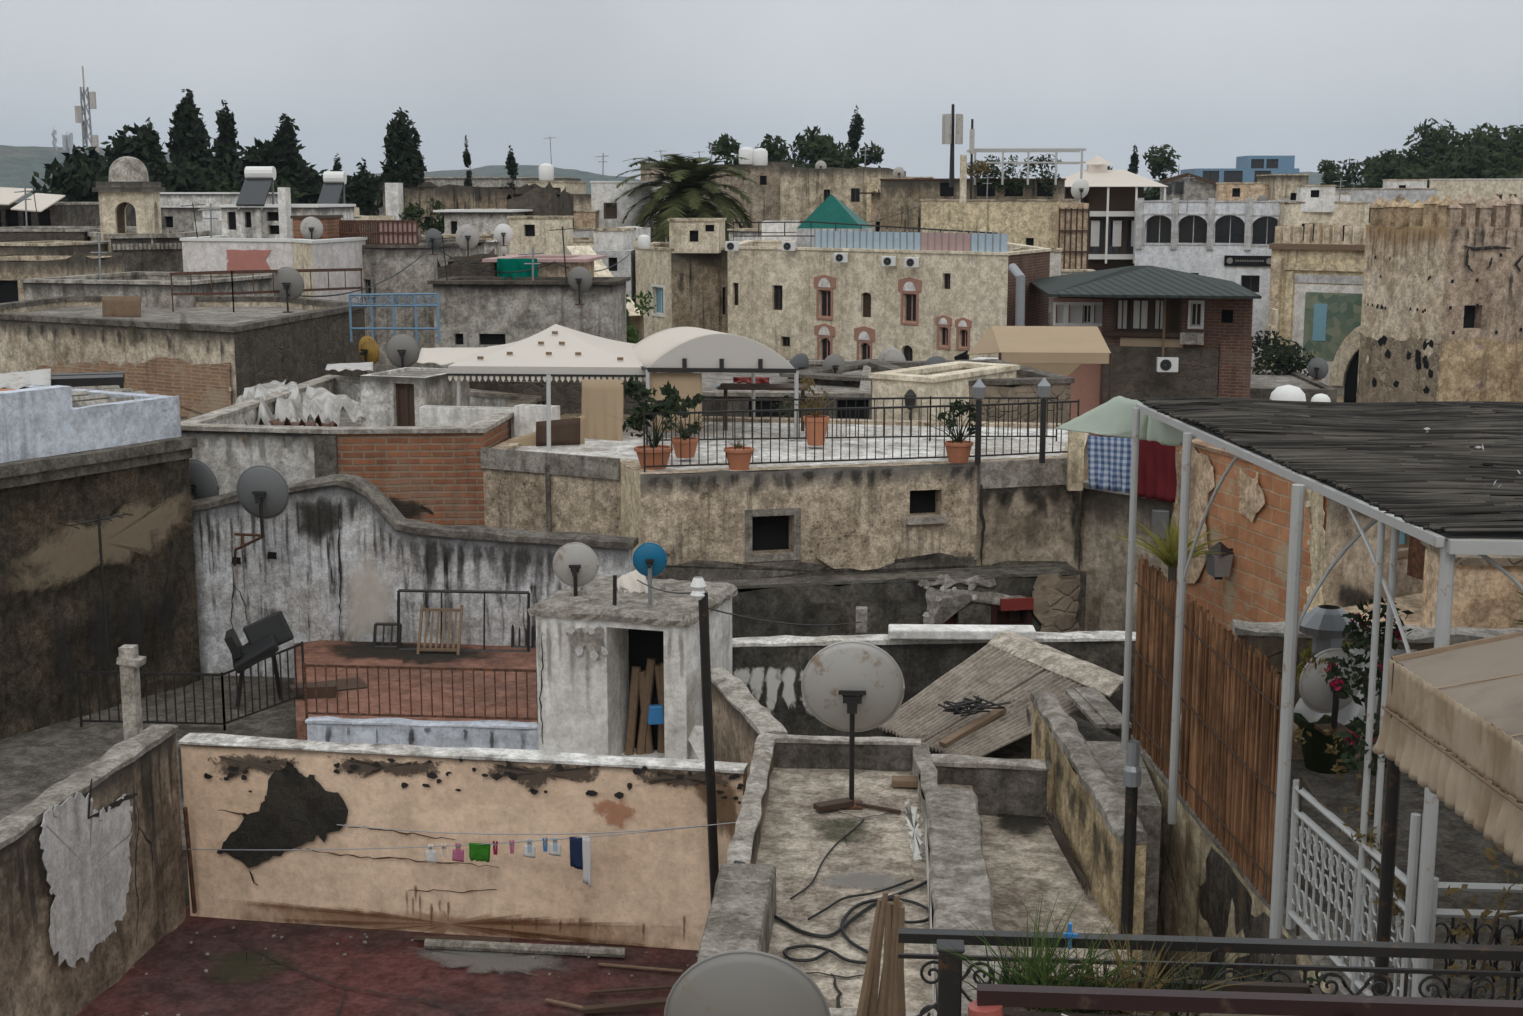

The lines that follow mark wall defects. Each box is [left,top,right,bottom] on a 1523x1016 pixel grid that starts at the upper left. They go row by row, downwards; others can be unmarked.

damp [199,497,356,588]
damp [389,497,424,518]
damp [333,529,554,664]
spalling [652,552,1080,633]
peeling [204,754,315,803]
peeling [328,756,744,804]
peeling [39,791,133,968]